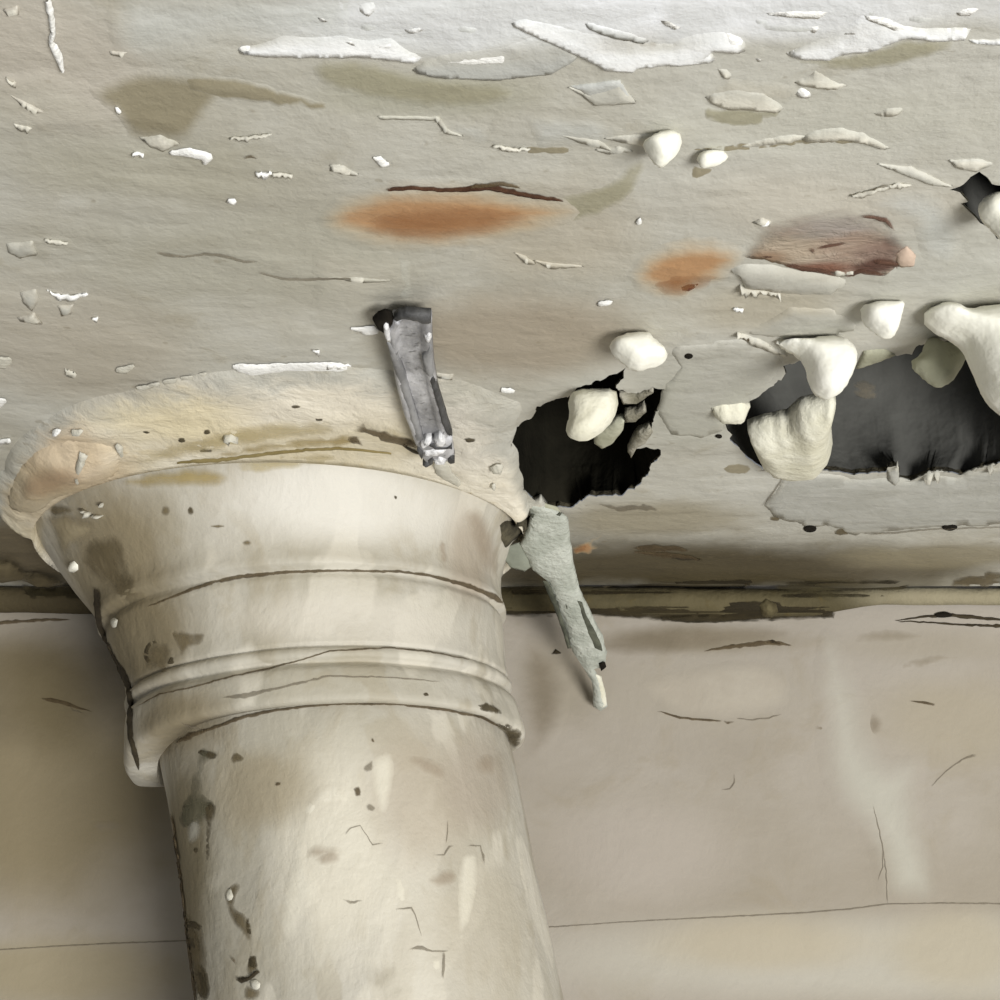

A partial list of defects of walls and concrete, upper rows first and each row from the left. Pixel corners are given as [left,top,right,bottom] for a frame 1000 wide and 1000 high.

peeling [594,163,983,466]
peeling [949,158,993,184]